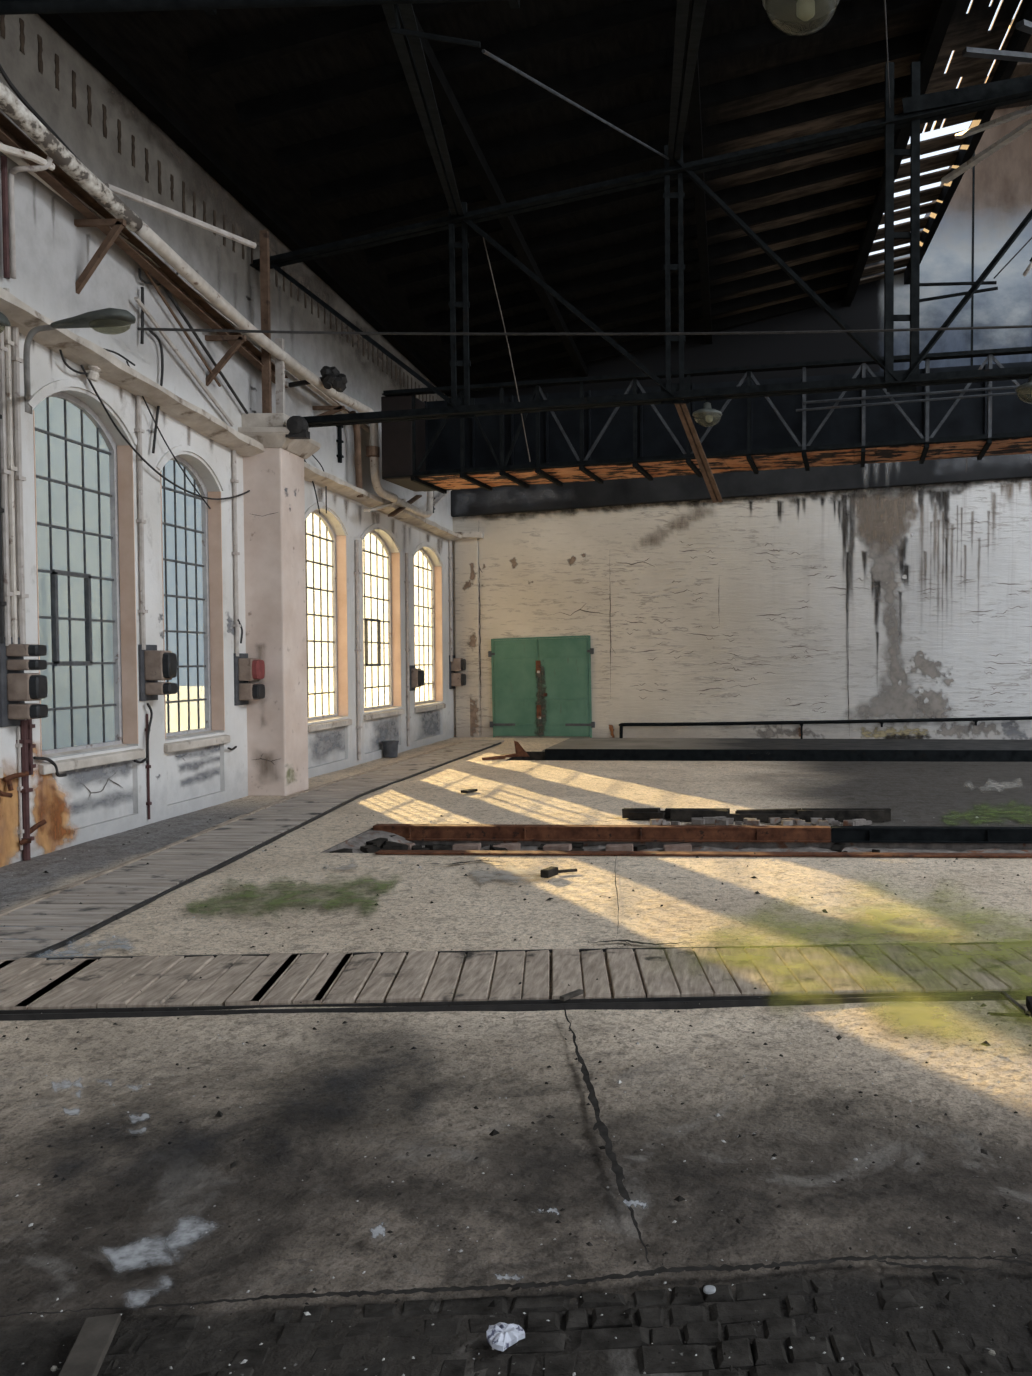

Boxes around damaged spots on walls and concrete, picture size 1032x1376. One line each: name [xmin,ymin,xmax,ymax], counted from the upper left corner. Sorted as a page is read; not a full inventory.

damp [455,453,1032,665]
spalling [507,492,1032,762]
rust [0,748,74,867]
crack [0,1006,1032,1317]